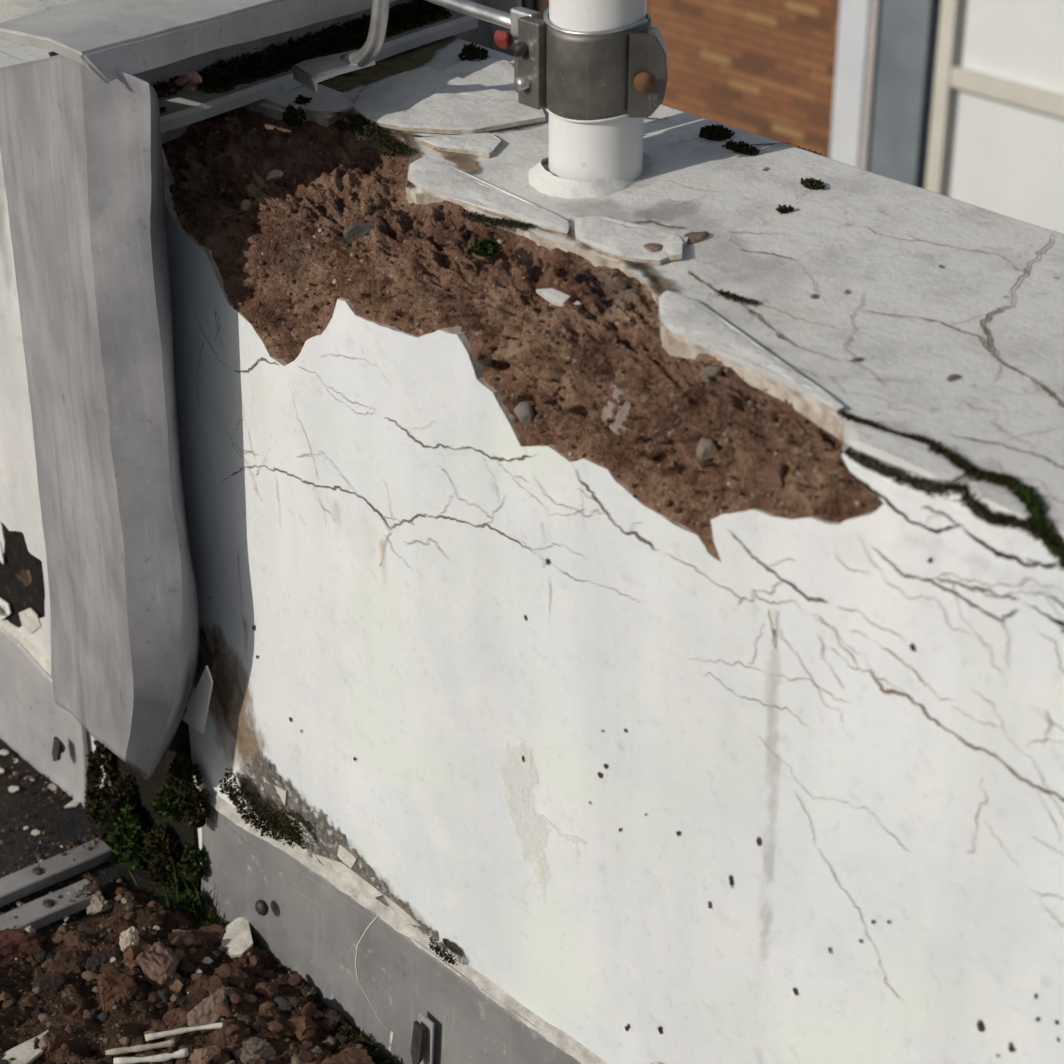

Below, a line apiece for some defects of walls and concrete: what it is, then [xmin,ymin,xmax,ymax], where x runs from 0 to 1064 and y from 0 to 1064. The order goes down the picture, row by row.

spalling [163,56,1032,558]
crack [679,222,1064,410]
peeling [0,525,45,633]
crack [196,311,655,581]
crack [835,472,1064,672]
crack [951,403,1064,503]
spalling [1054,522,1064,538]
crack [682,533,1064,855]
crack [830,867,899,998]